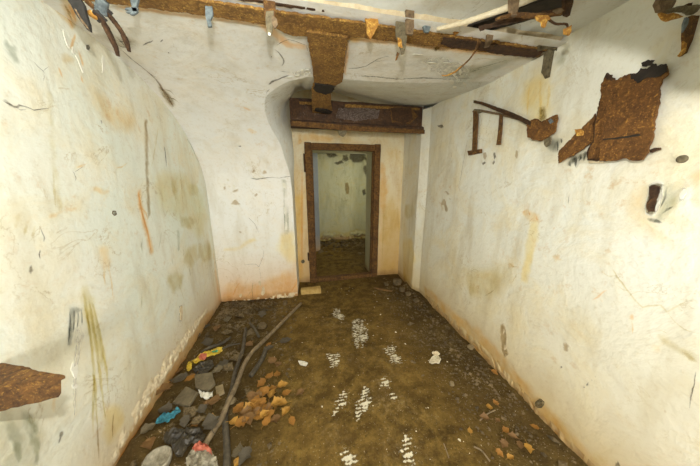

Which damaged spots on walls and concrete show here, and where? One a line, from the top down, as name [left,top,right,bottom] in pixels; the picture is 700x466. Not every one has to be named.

rust [275,2,324,12]
spalling [644,181,664,222]
rust [0,364,50,382]